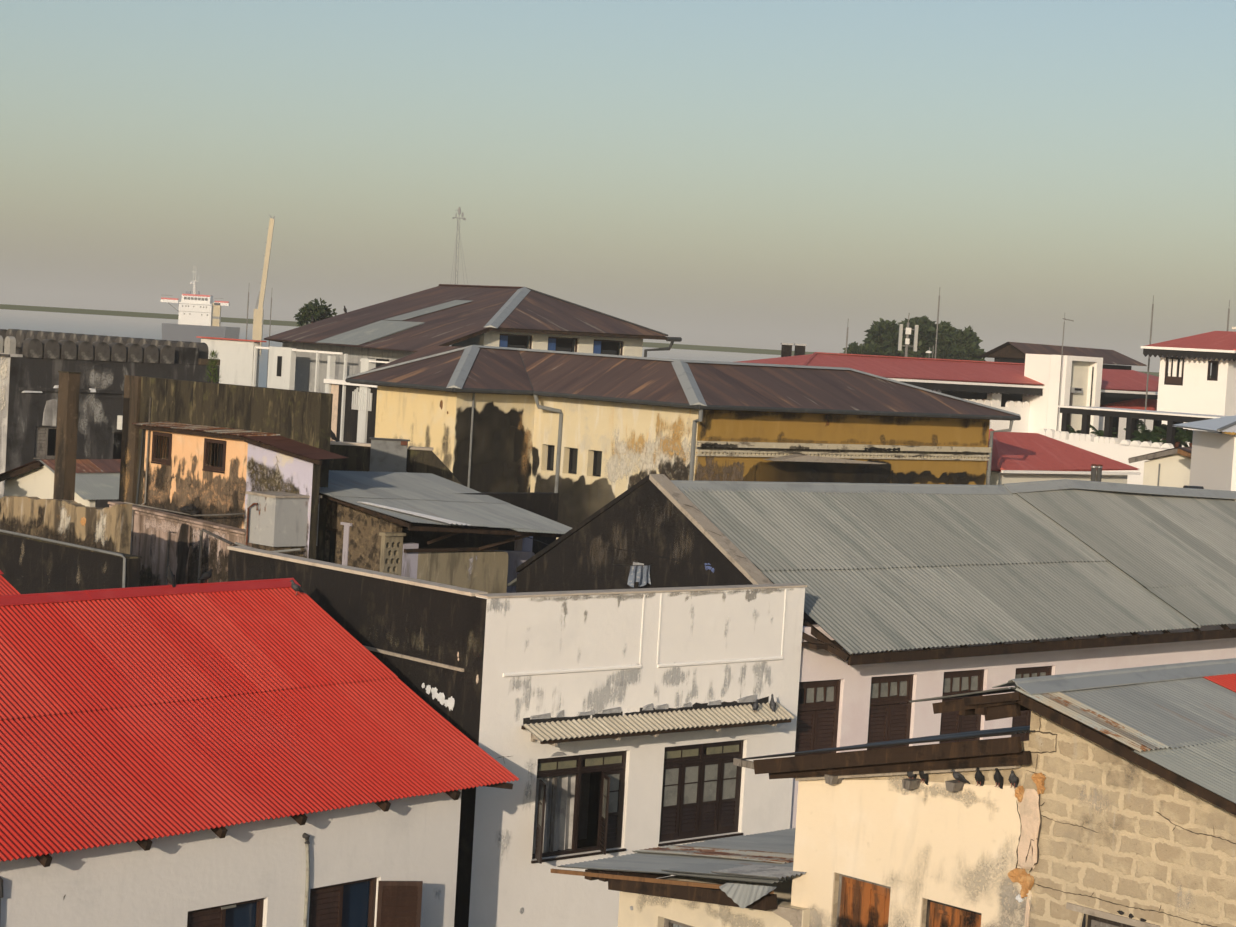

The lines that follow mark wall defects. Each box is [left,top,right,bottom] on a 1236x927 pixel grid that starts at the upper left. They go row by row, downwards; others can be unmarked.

leakage [411,402,615,528]
peeling [607,432,696,482]
leakage [0,502,115,561]
leakage [121,449,299,587]
flaking render [523,695,769,725]
peeling [1015,773,1046,869]
crack [1016,719,1217,927]
crack [1155,811,1236,844]
leakage [964,912,975,927]
leakage [966,858,1026,927]